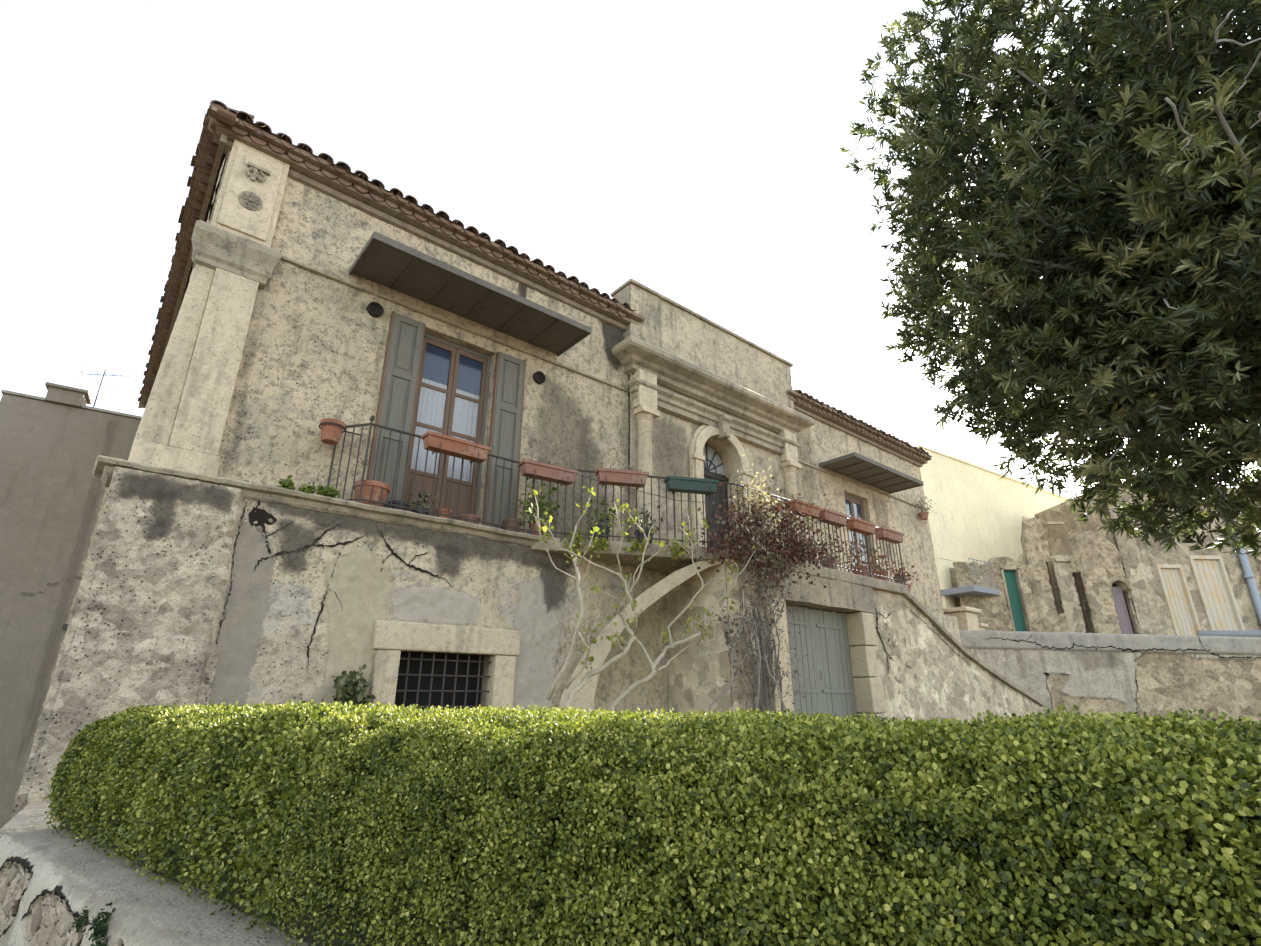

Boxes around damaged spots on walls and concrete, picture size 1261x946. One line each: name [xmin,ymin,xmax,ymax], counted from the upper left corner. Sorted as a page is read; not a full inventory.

crack [216,500,454,673]
spalling [0,861,87,946]